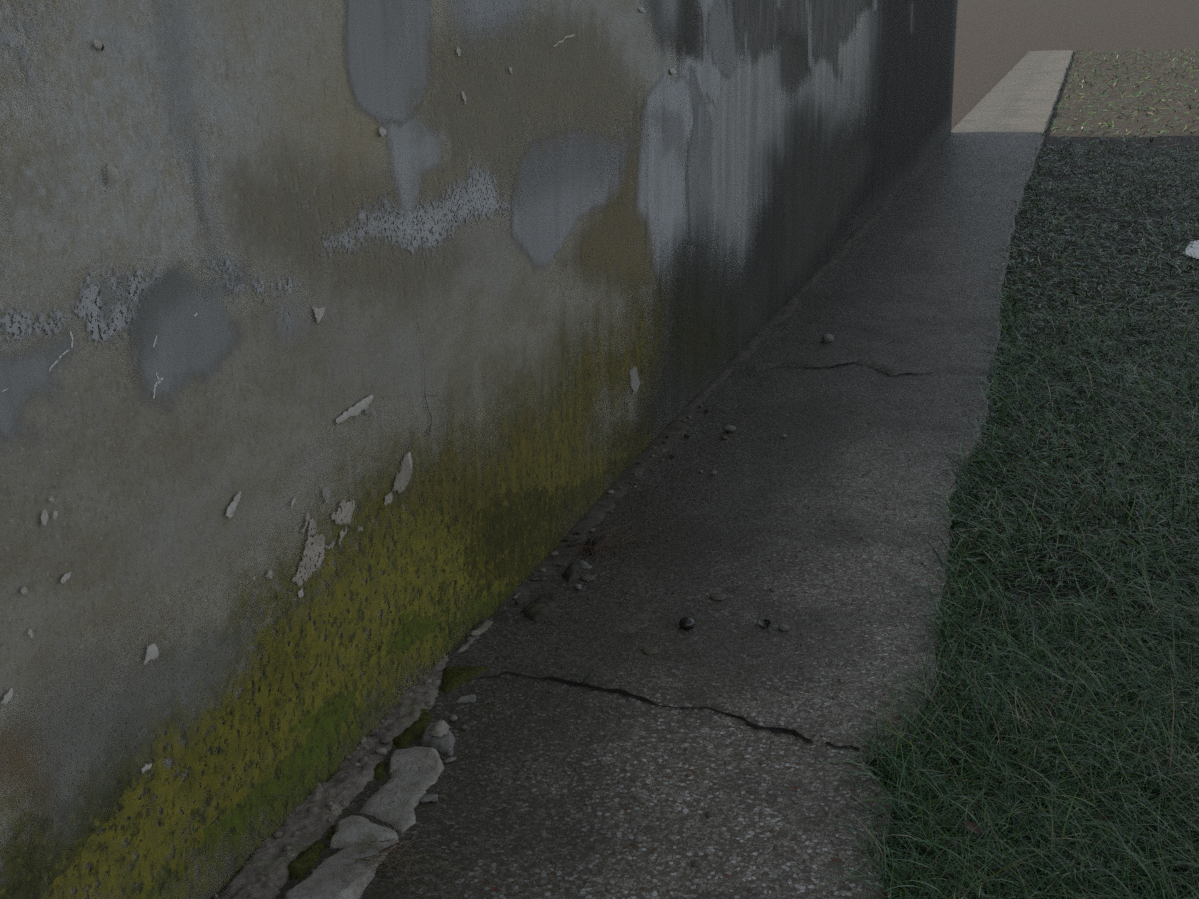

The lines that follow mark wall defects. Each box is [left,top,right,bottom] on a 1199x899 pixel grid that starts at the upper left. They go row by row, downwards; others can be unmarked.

flaking render [384,452,413,505]
flaking render [292,487,363,598]
leakage [50,660,222,790]
crack [471,672,860,750]